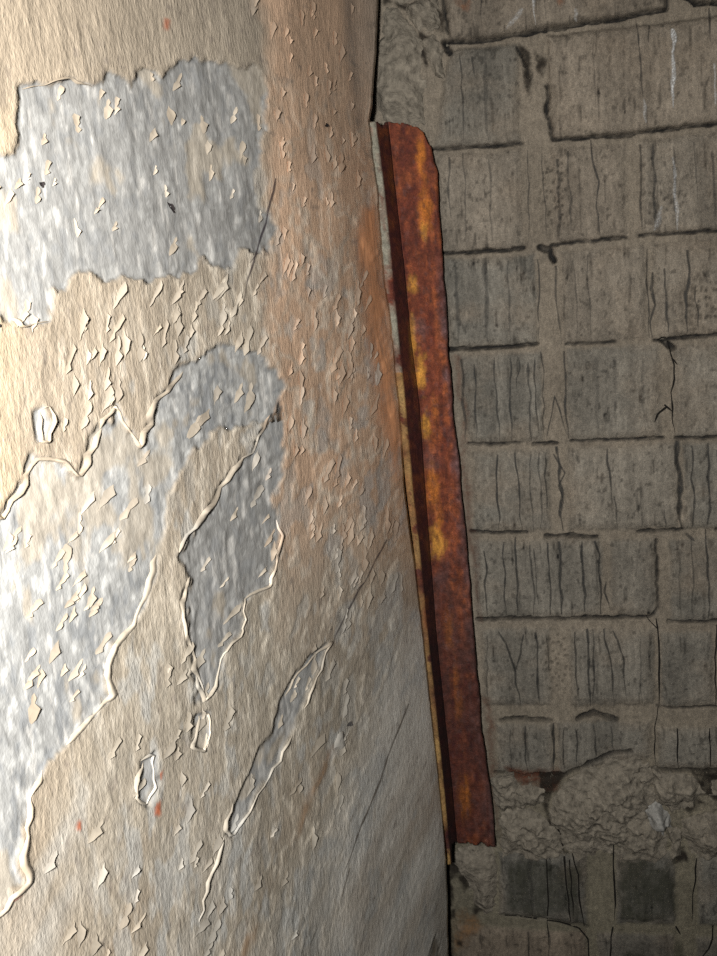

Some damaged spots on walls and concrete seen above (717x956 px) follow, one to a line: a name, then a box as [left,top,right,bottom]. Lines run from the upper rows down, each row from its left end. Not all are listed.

peeling [305,93,357,172]
peeling [323,270,382,442]
rust [359,211,399,454]
crack [654,341,678,437]
peeling [0,56,311,918]
peeling [304,453,403,634]
peeling [310,678,353,758]
spalling [540,771,564,825]
spalling [645,801,672,836]
spalling [686,769,717,810]
peeling [62,921,110,956]
peeling [120,889,146,933]